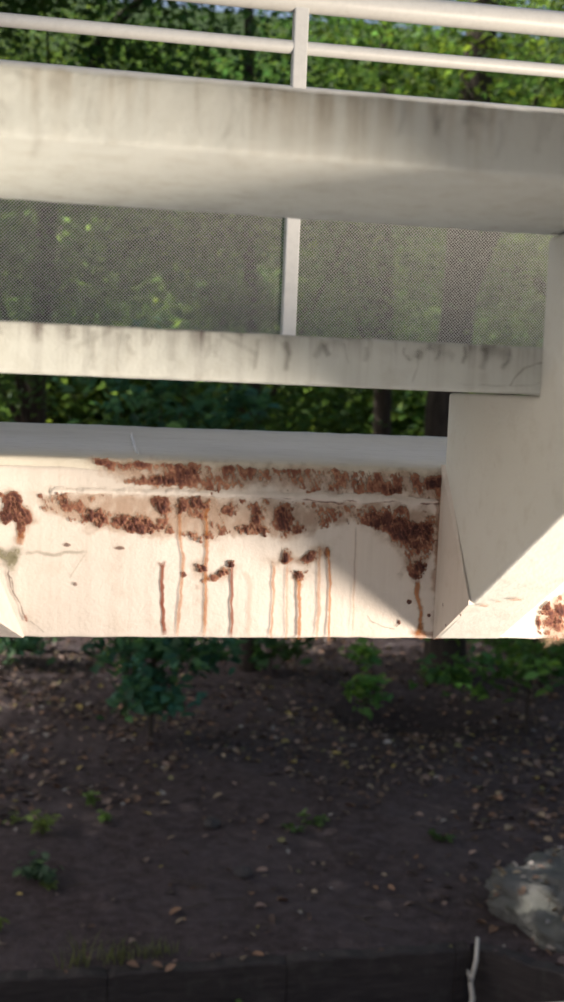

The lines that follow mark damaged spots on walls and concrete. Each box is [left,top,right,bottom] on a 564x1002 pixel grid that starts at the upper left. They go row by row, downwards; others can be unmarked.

rust [0,491,32,539]
crack [7,571,27,621]
rust [160,507,235,635]
rust [270,547,332,637]
rust [407,582,431,635]